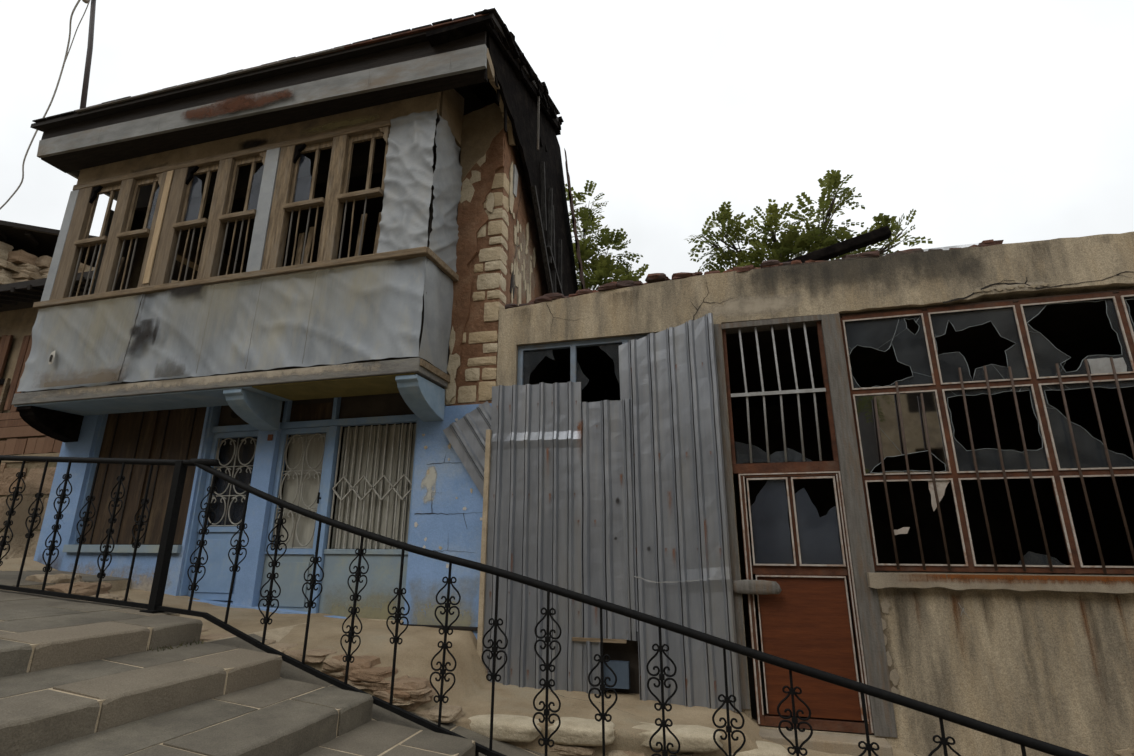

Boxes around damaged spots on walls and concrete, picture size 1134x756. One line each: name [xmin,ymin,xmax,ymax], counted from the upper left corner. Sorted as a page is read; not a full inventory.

rust [183,90,292,119]
flaking render [445,48,536,402]
crack [943,271,1132,303]